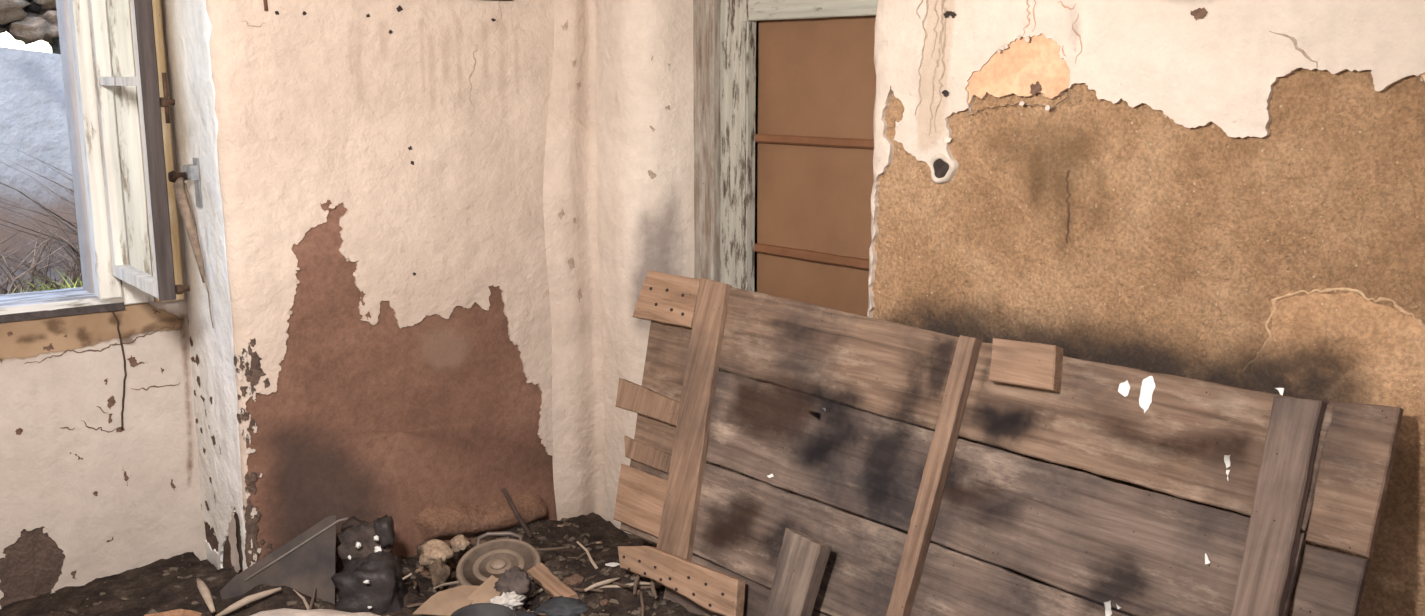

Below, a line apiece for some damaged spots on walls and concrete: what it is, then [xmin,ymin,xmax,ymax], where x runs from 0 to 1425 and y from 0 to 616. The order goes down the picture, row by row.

crack [468,44,478,118]
crack [915,0,947,136]
flaking render [872,34,1425,377]
crack [24,322,179,364]
crack [62,406,118,433]
spalling [104,378,126,432]
spalling [188,320,221,454]
flaking render [201,200,557,575]
flaking render [958,436,1251,518]
flaking render [0,527,76,608]
flaking render [930,541,1135,616]
flaking render [1289,443,1425,616]